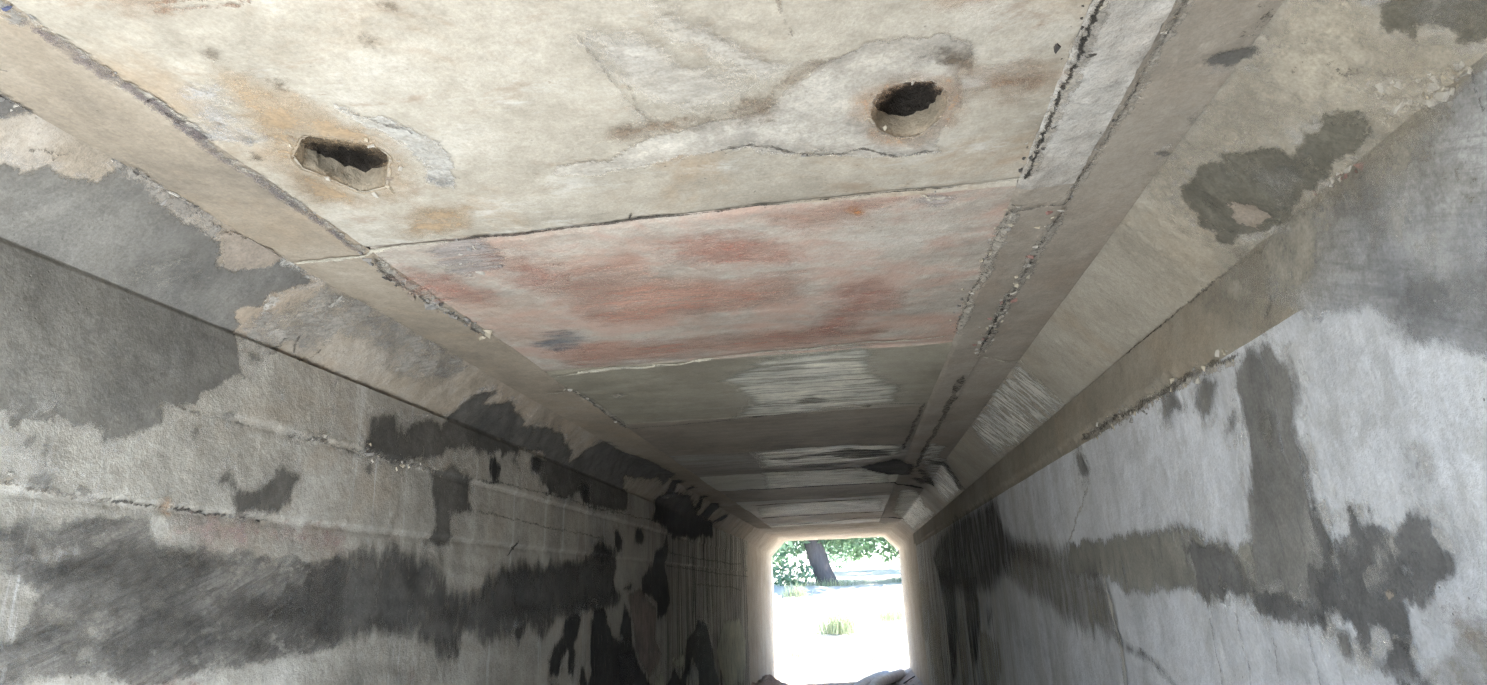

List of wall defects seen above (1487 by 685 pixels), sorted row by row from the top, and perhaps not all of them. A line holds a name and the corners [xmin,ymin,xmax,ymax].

spalling [0,94,33,119]
water stain [1151,0,1487,257]
crack [466,144,952,239]
crack [0,472,266,522]
water stain [147,499,170,537]
water stain [277,390,746,685]
water stain [753,343,1455,685]